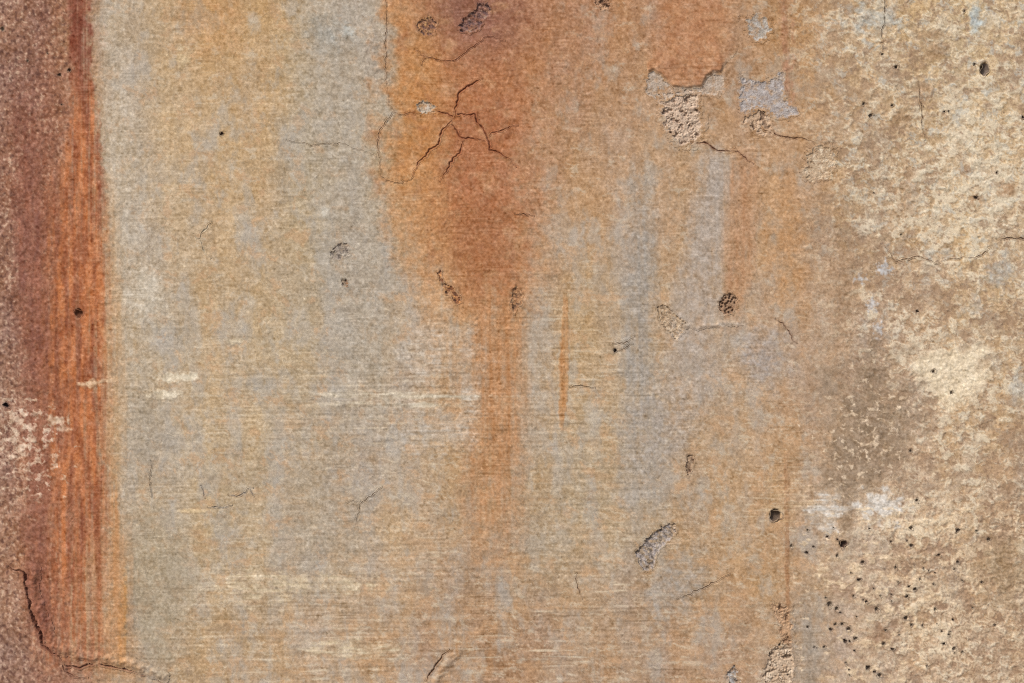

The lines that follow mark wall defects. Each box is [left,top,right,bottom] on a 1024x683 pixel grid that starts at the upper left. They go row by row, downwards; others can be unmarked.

crack [287,0,519,184]
spalling [457,1,492,35]
peeling [638,0,803,152]
corrosion [5,0,149,683]
corrosion [360,0,618,591]
spalling [634,521,678,573]
crack [8,565,162,683]